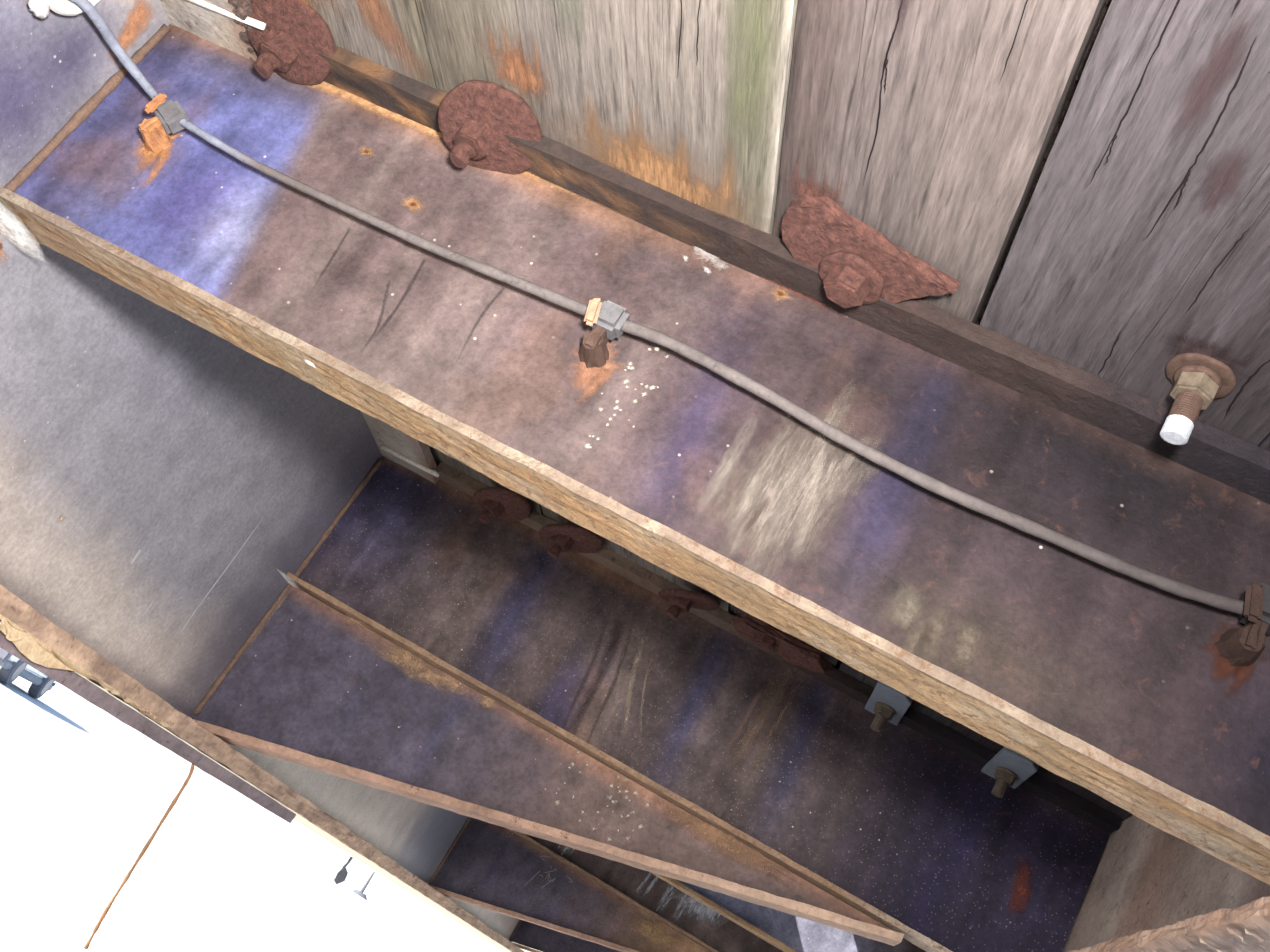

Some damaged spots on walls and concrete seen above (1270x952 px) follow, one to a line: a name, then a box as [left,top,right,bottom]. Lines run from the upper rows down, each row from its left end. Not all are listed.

rust [119,2,150,50]
rust [228,0,259,62]
crack [999,0,1028,84]
crack [863,0,903,187]
crack [1086,0,1180,187]
rust [139,135,178,178]
crack [1144,36,1270,240]
rust [579,349,616,394]
rust [1176,339,1250,372]
crack [1225,360,1270,417]